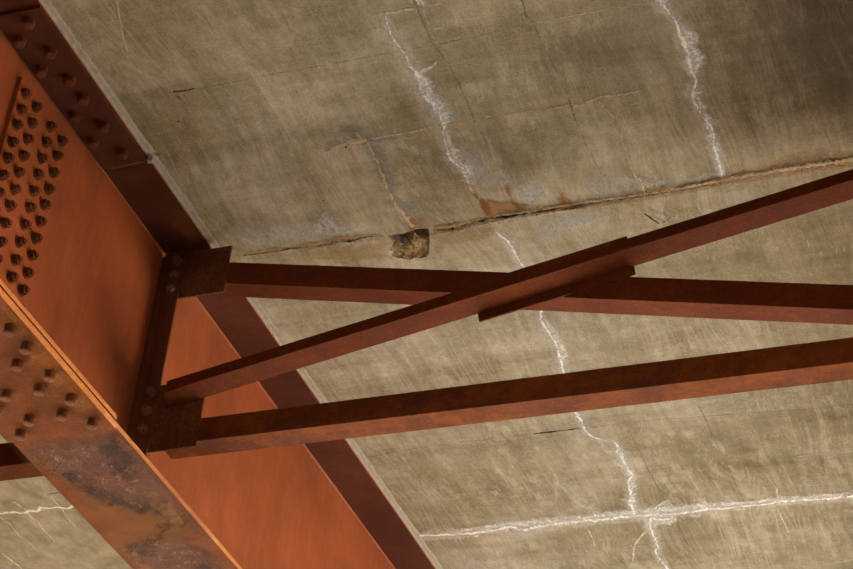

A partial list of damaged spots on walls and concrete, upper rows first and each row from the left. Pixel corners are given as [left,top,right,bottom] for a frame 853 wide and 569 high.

crack [298,0,763,267]
corrosion [434,155,853,235]
crack [243,235,383,256]
spalling [389,228,430,260]
crack [539,311,568,373]
crack [1,498,76,550]
corrosion [27,436,223,569]